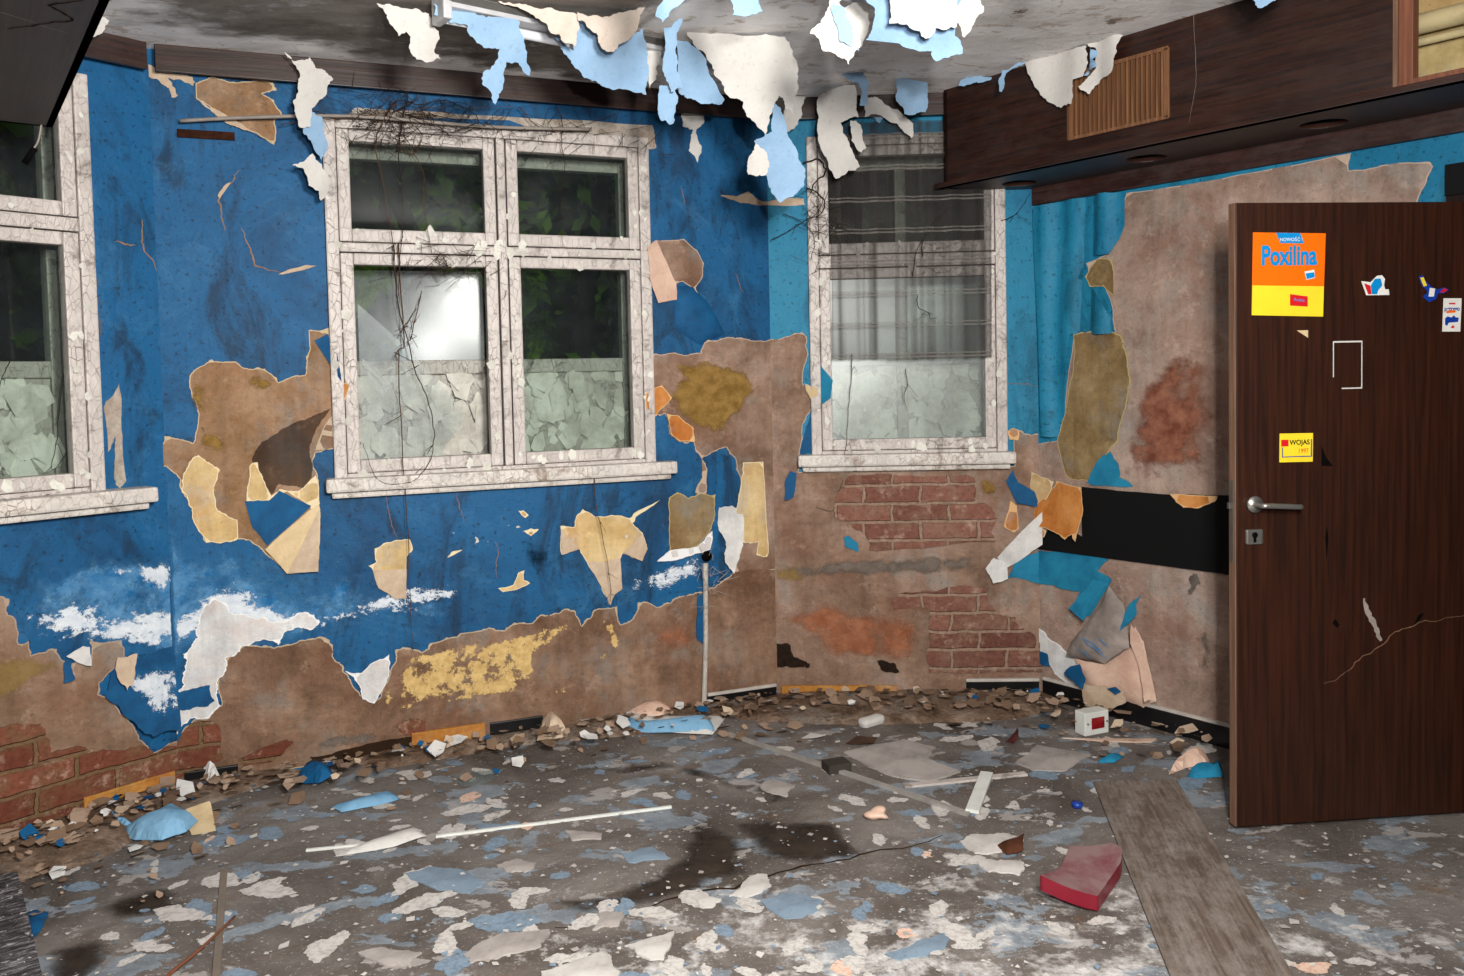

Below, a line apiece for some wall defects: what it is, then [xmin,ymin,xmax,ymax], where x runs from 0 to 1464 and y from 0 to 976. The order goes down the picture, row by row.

crack [9,0,83,29]
peeling [1254,0,1275,8]
peeling [350,0,984,203]
peeling [959,19,1123,108]
peeling [0,153,1433,831]
peeling [565,830,603,841]